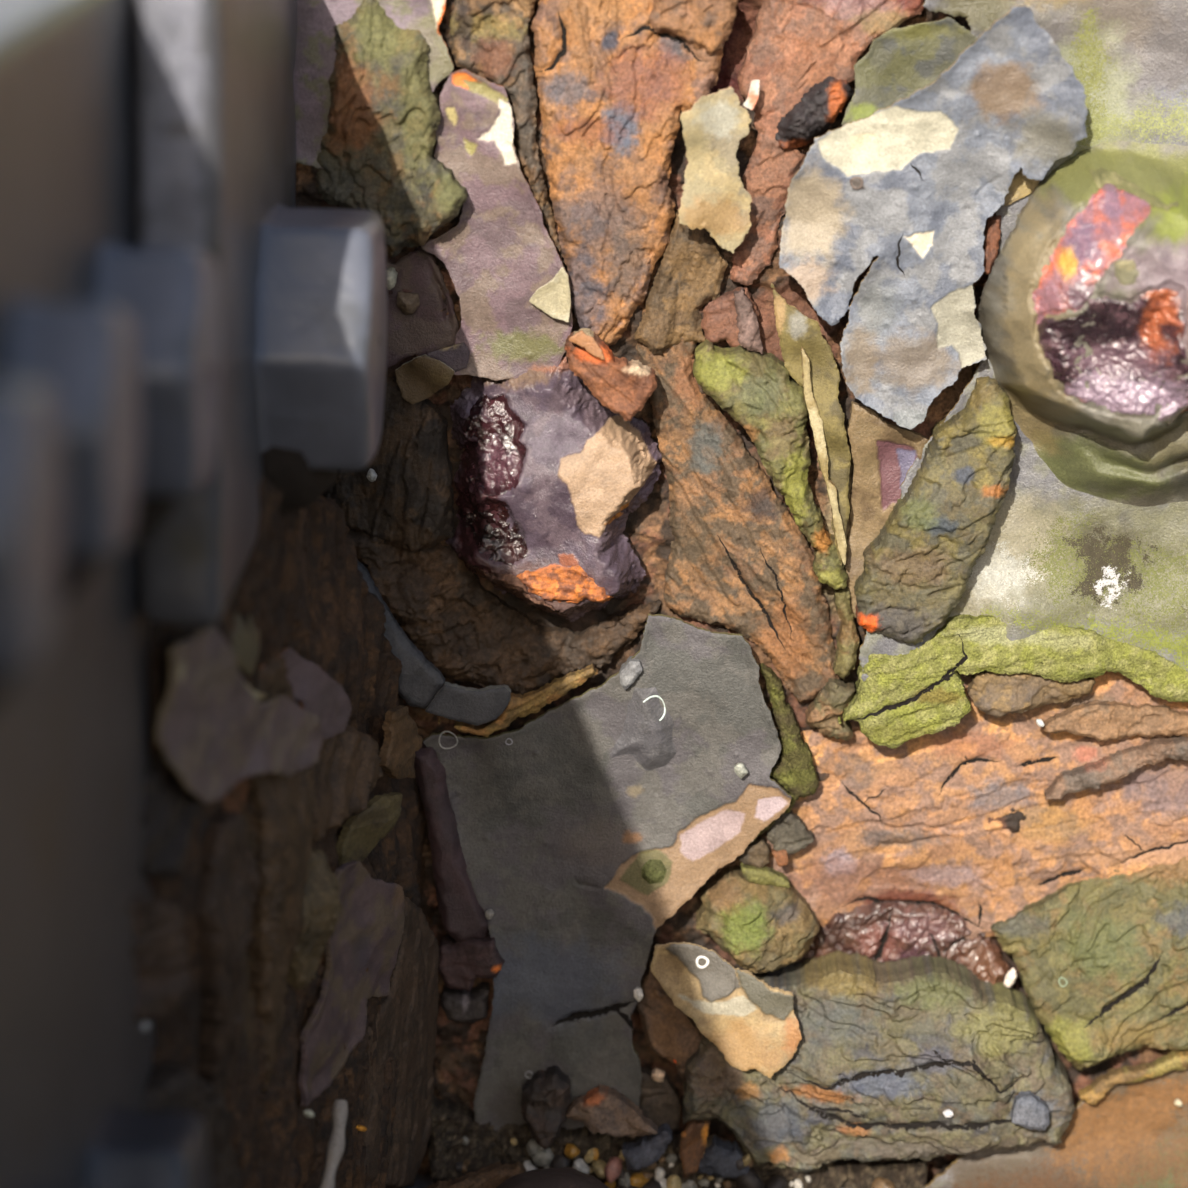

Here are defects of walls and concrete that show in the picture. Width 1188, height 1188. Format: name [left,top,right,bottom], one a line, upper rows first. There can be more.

corrosion [435,0,461,99]
peeling [377,0,657,421]
peeling [678,80,759,254]
corrosion [710,0,763,185]
corrosion [609,111,979,504]
peeling [771,5,1088,680]
corrosion [1031,183,1188,426]
spalling [462,394,613,616]
corrosion [140,355,645,1188]
corrosion [475,376,1188,998]
peeling [650,942,802,1078]
spalling [806,901,1022,992]